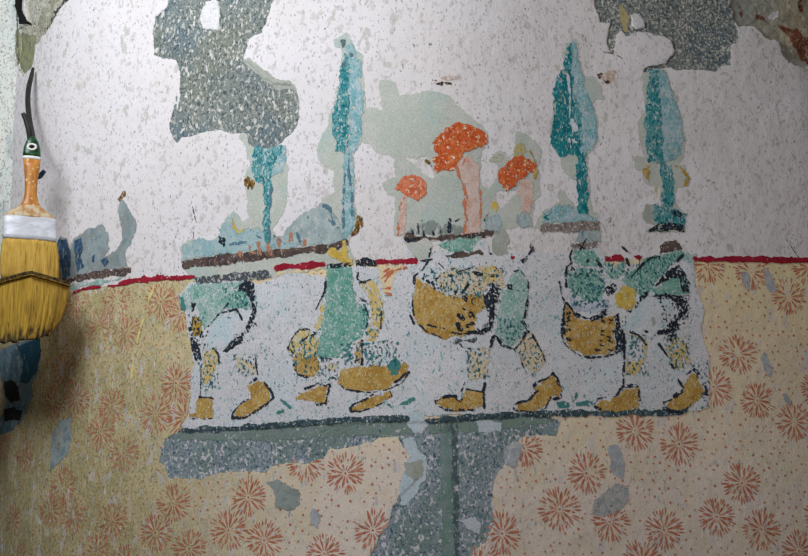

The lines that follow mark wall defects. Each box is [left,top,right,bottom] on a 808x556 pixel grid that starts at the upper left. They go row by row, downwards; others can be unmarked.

flaking render [15,0,69,76]
flaking render [152,0,604,282]
flaking render [594,0,808,233]
flaking render [159,411,560,556]